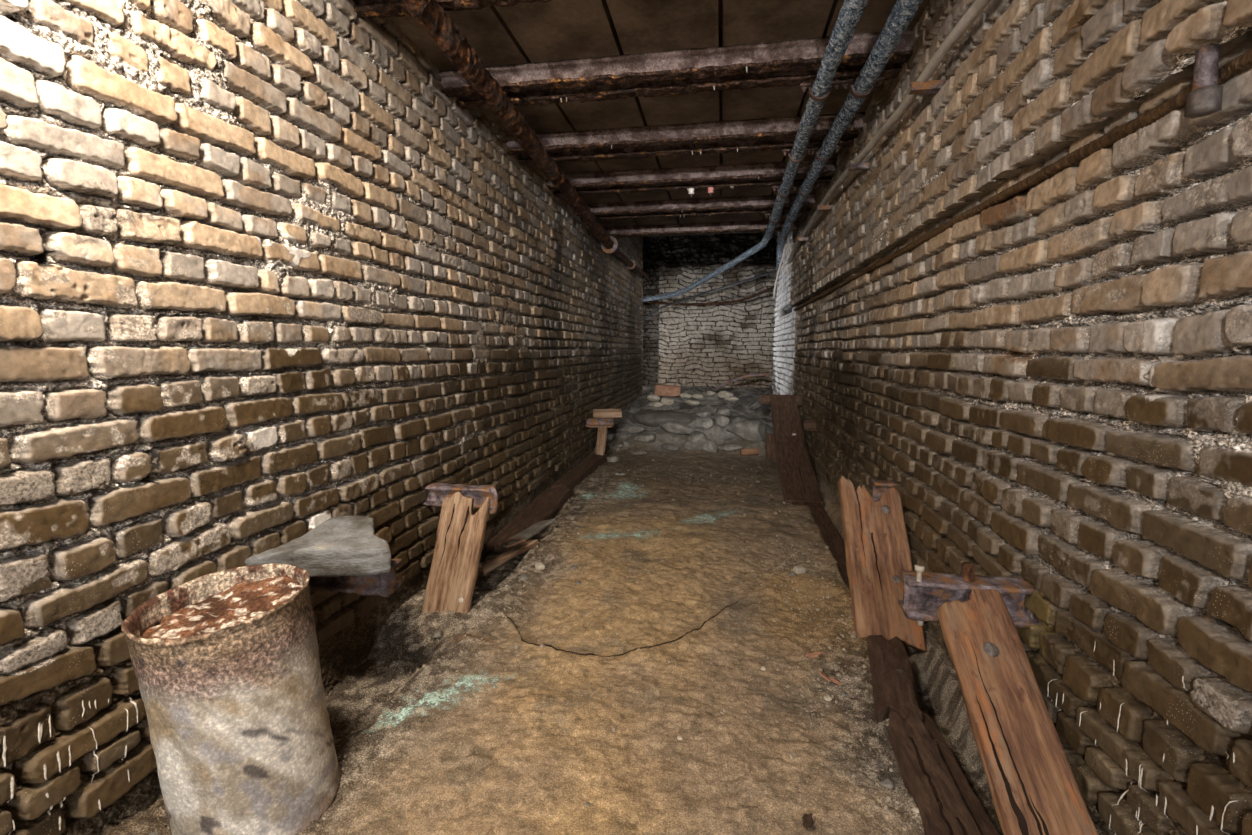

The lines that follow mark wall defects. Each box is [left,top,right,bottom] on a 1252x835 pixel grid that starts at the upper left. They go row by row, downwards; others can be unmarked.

crack [507,602,737,657]
damp [1182,673,1252,729]
damp [2,736,14,803]
damp [44,745,71,830]
damp [82,700,109,782]
damp [1109,760,1167,835]
damp [1196,800,1237,835]